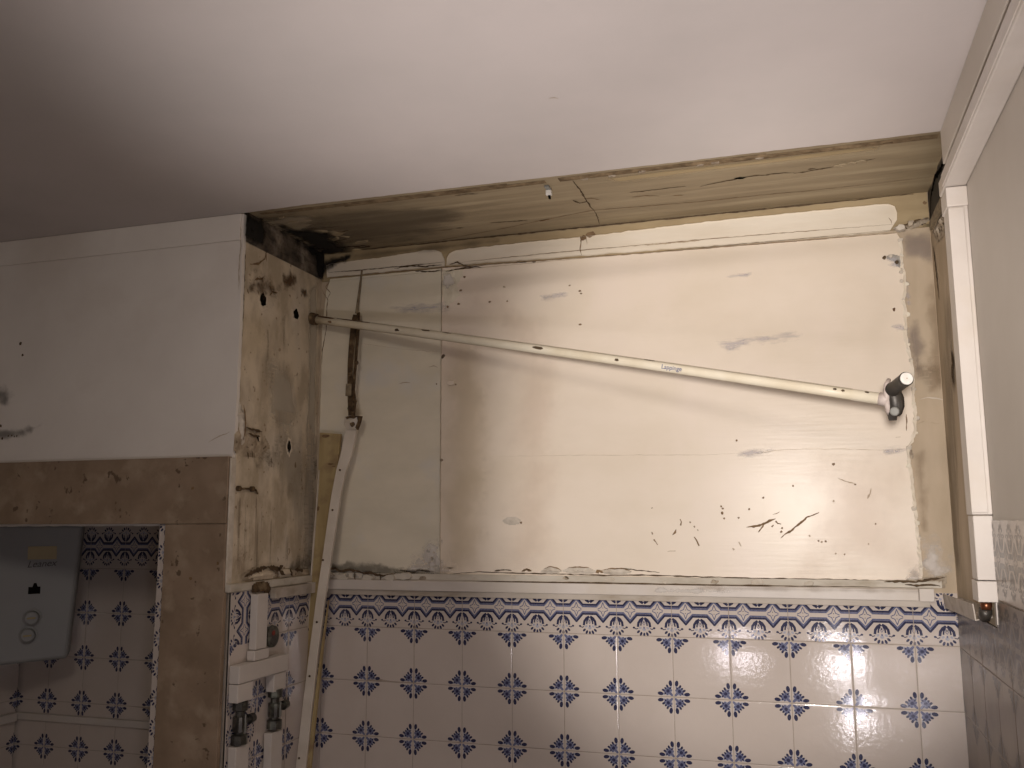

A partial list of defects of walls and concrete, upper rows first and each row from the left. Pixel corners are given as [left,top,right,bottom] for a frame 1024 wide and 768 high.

damp [280,225,350,275]
crack [322,142,944,354]
flaking render [234,402,270,459]
flaking render [329,567,429,580]